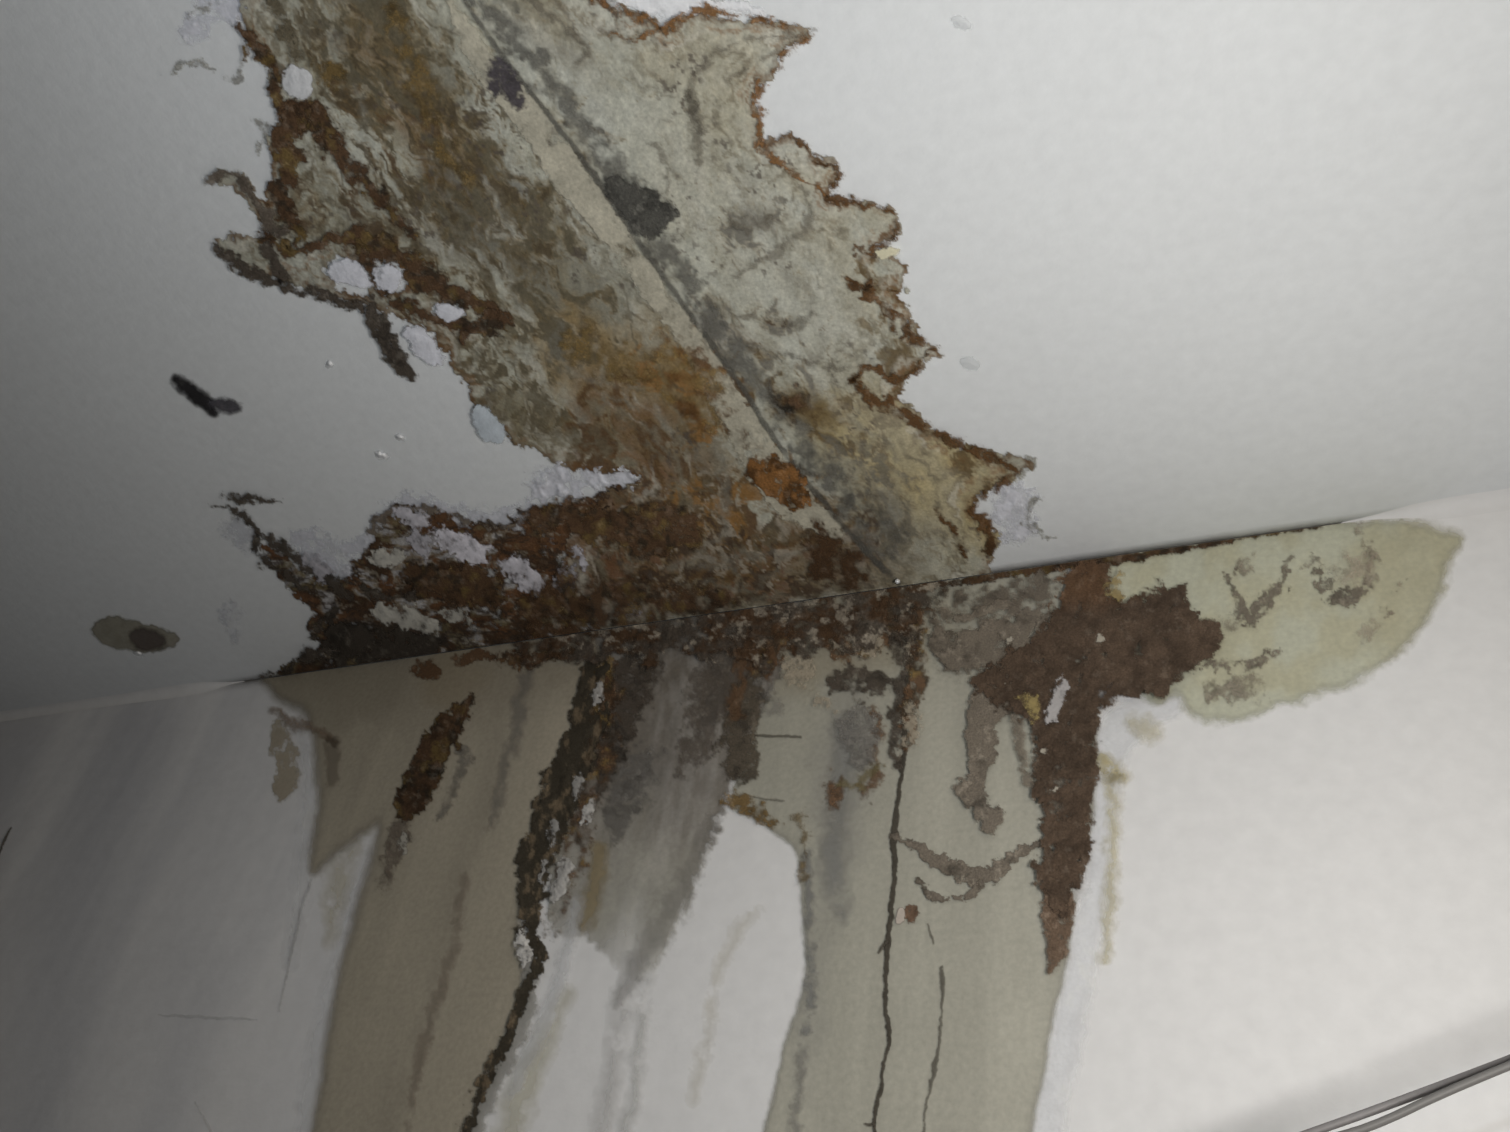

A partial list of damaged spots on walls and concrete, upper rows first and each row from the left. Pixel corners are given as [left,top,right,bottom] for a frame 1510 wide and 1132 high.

flaking render [204,0,1034,638]
leakage [92,616,180,653]
rust [212,484,639,678]
rust [379,692,475,883]
leakage [263,519,1462,1132]
crack [865,639,912,1132]
crack [923,930,945,1132]